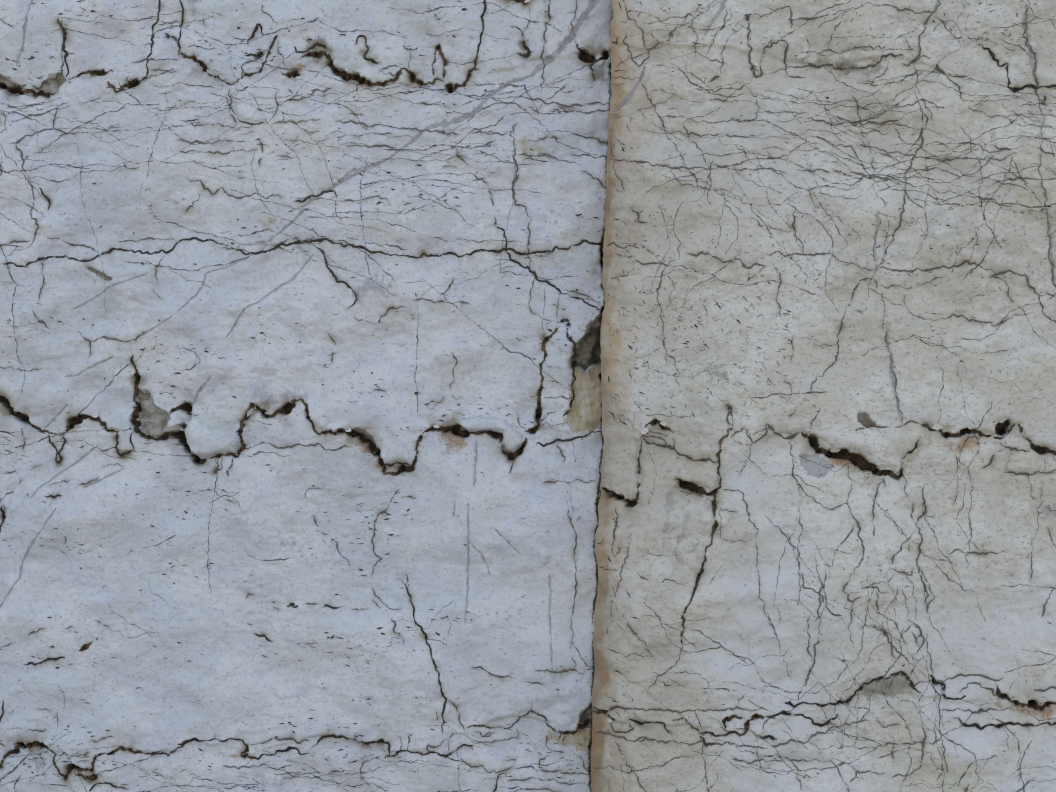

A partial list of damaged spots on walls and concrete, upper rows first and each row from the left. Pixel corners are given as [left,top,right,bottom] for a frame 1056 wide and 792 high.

spalling [0,73,66,98]
crack [0,0,1056,623]
peeling [567,313,602,432]
spalling [137,389,184,438]
peeling [641,415,668,435]
spalling [857,412,876,428]
crack [0,403,1055,792]